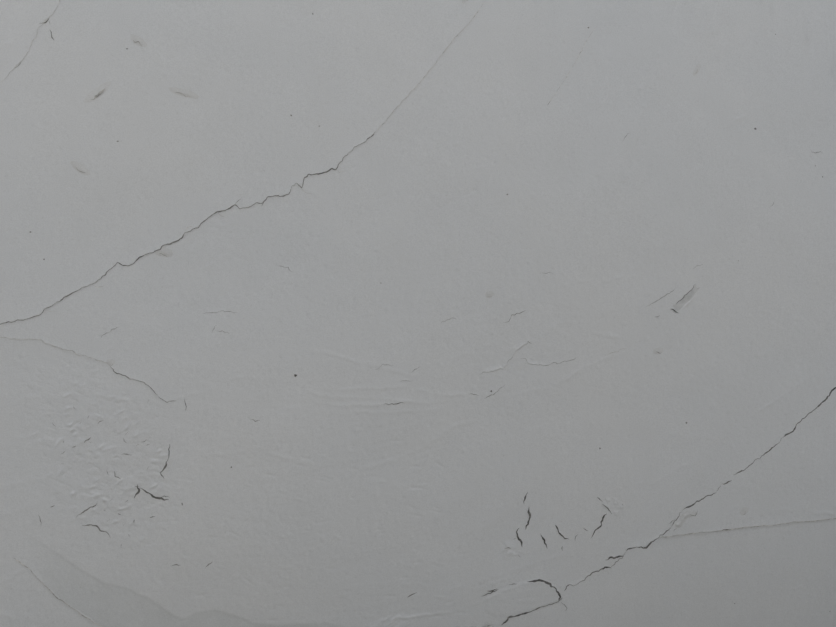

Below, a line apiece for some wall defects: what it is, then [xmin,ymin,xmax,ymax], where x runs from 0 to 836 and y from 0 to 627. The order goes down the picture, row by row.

crack [0,0,486,325]
crack [516,492,606,551]
crack [563,382,836,591]